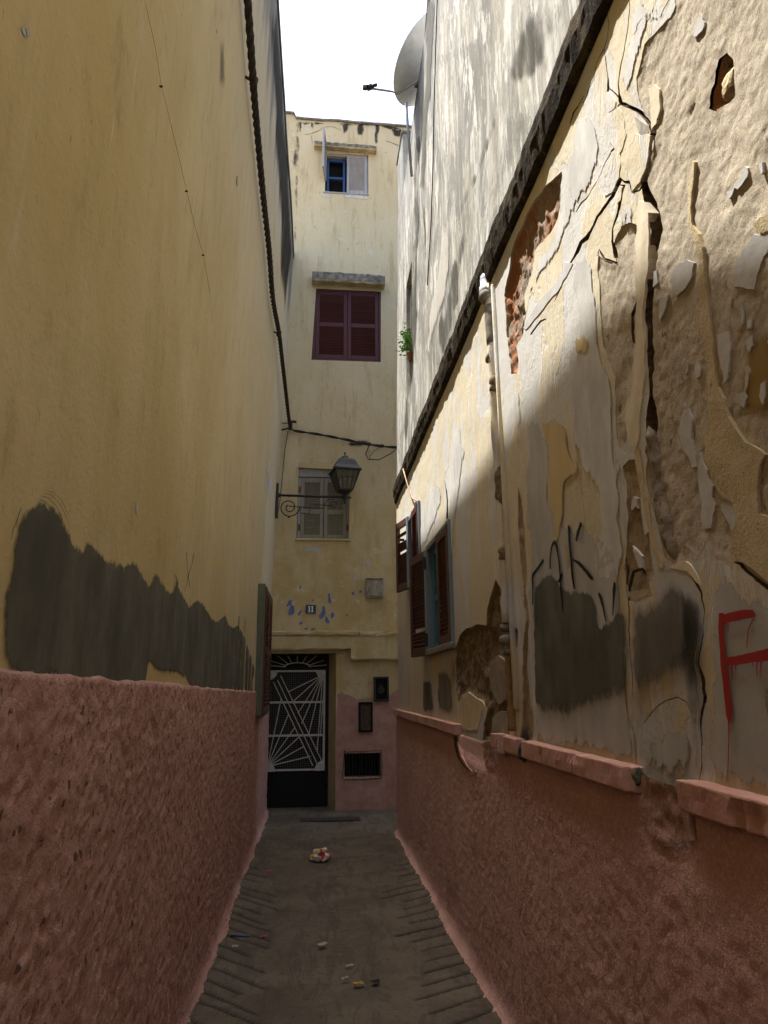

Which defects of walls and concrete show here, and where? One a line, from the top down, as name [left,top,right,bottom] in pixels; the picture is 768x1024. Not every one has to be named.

crack [608,84,657,136]
crack [574,179,663,263]
crack [631,279,655,372]
spalling [456,0,768,848]
crack [650,399,658,435]
leakage [682,600,699,688]